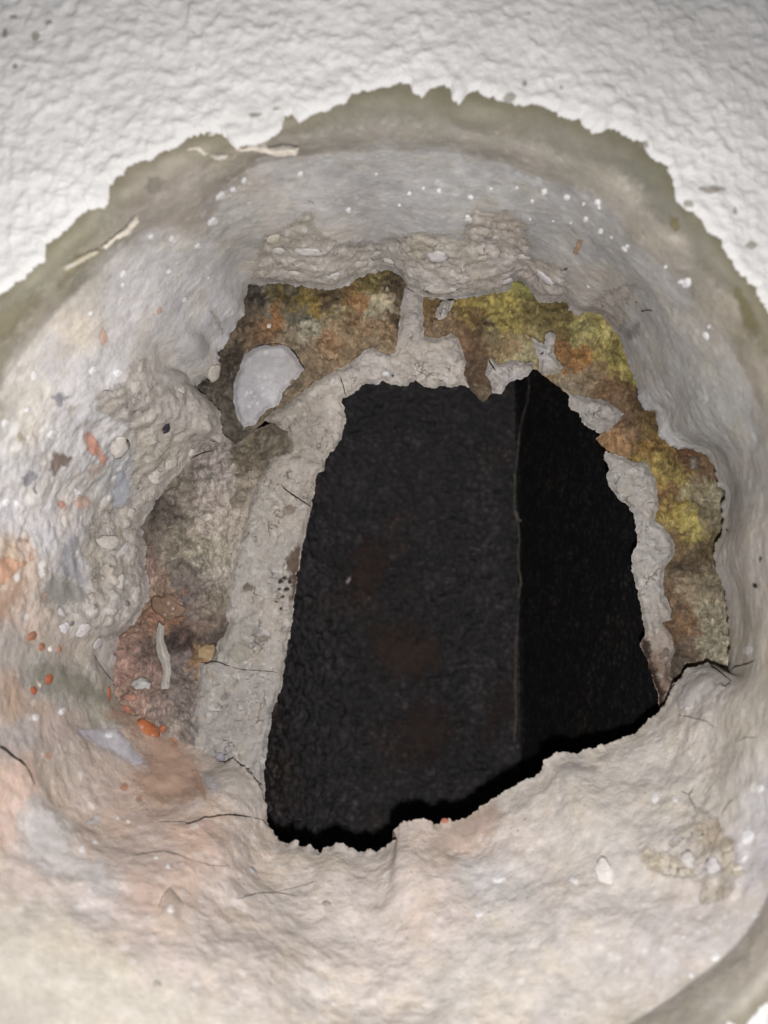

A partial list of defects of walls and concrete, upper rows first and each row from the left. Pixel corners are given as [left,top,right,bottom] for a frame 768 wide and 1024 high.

peeling [0,82,768,352]
flaking render [208,364,221,383]
flaking render [54,359,219,650]
crack [160,814,269,827]
crack [132,850,224,867]
peeling [692,962,768,1024]